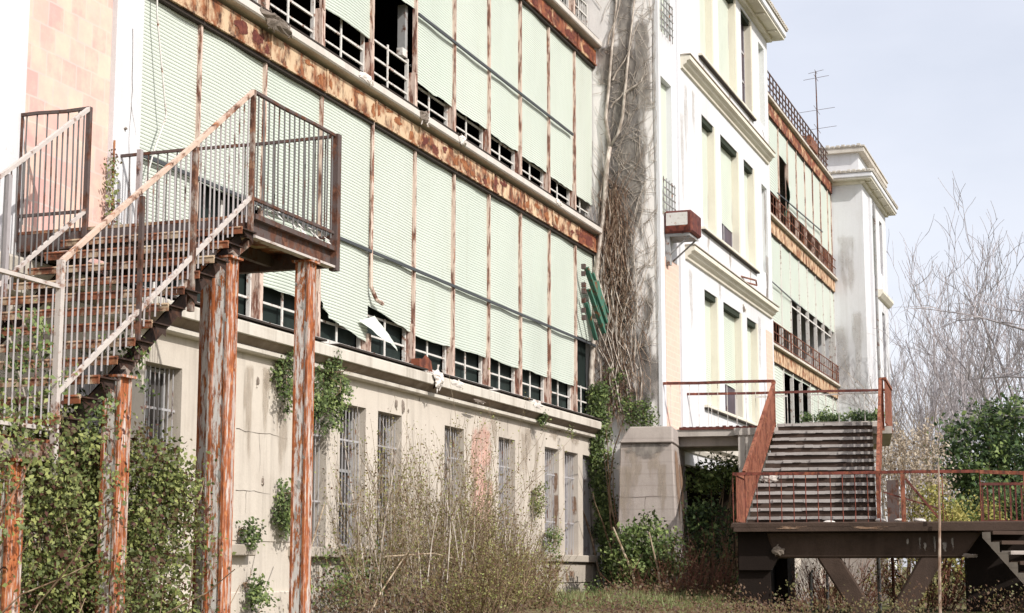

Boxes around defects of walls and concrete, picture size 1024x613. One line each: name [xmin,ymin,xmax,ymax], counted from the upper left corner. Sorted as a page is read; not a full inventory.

corrosion [351,89,507,191]
corrosion [294,386,305,489]